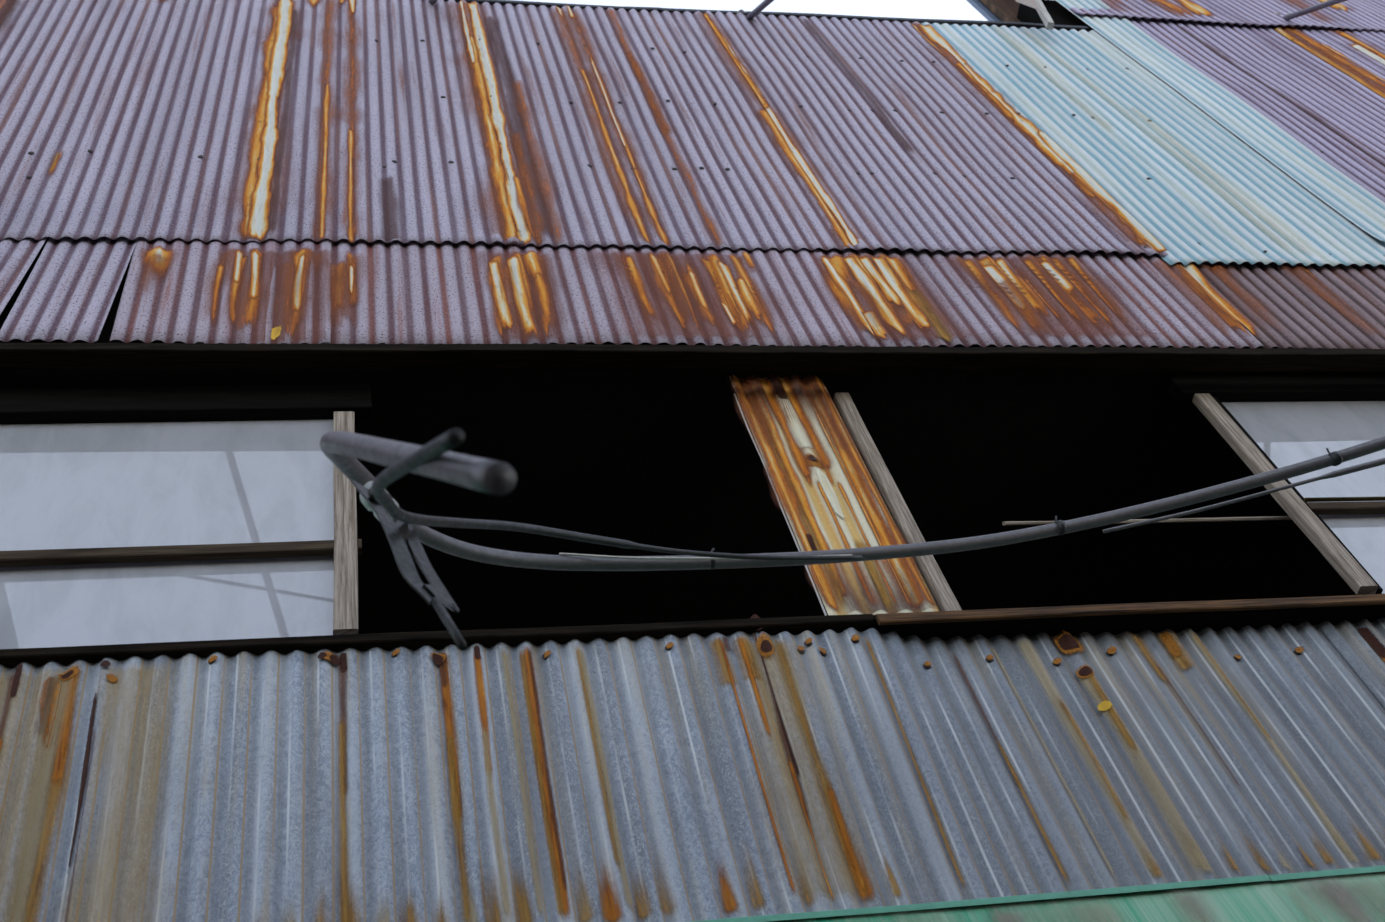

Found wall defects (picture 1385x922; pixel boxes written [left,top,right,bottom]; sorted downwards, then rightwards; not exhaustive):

corrosion [211,0,359,343]
corrosion [382,177,398,241]
corrosion [454,0,561,337]
corrosion [554,5,774,339]
corrosion [701,13,960,341]
corrosion [912,23,1263,337]
corrosion [1151,0,1385,166]
corrosion [729,374,939,615]
corrosion [11,666,80,922]
corrosion [711,614,873,903]
corrosion [1021,631,1211,875]
corrosion [1358,627,1385,661]